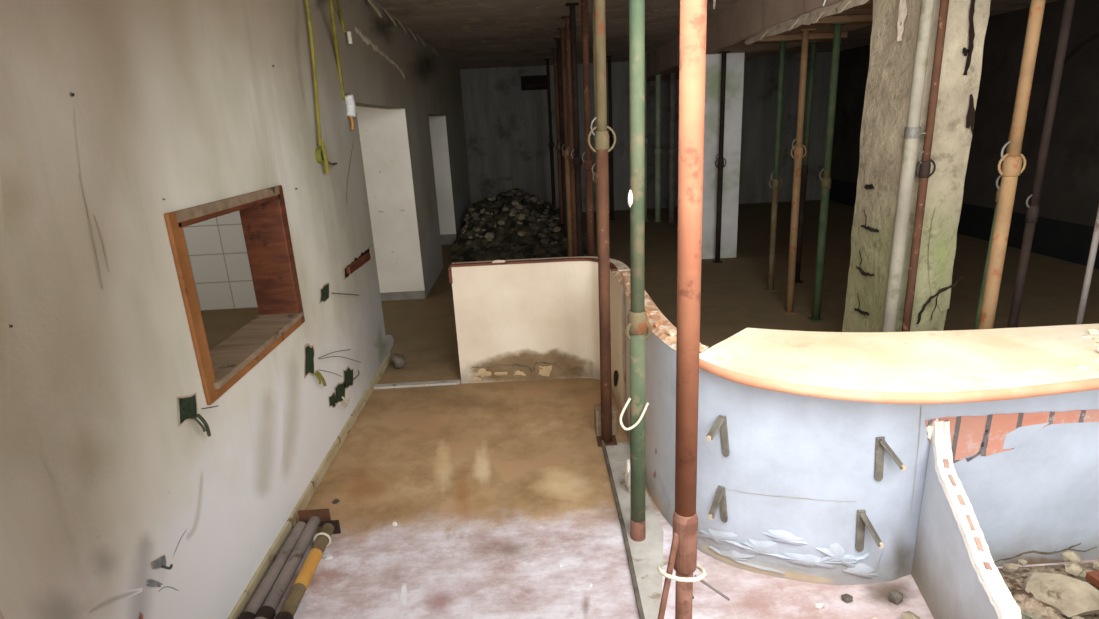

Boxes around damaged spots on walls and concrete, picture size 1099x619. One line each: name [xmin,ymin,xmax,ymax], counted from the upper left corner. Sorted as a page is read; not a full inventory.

crack [854,210,879,316]
crack [916,276,964,324]
leakage [412,346,600,418]
spalling [926,409,1099,619]